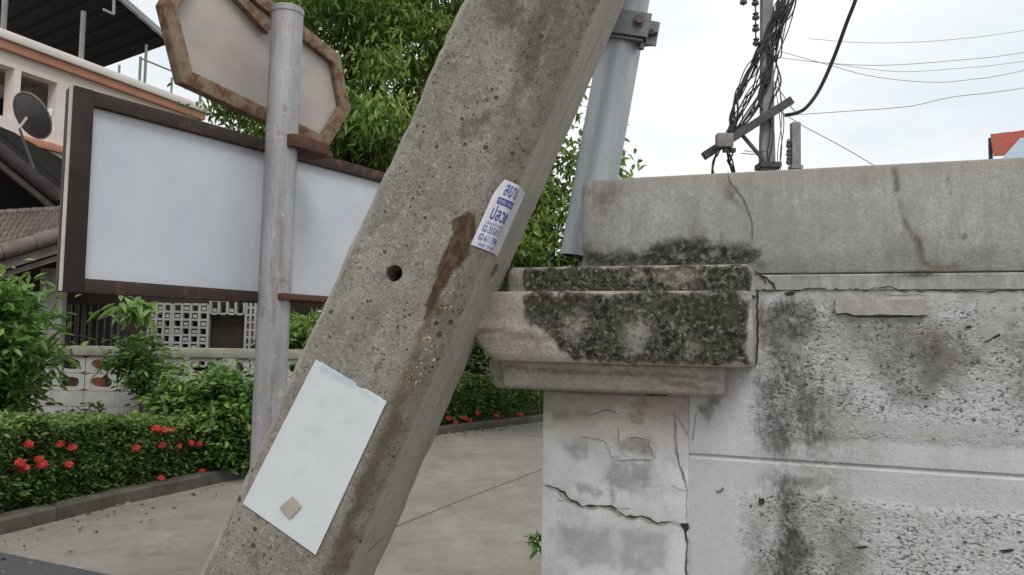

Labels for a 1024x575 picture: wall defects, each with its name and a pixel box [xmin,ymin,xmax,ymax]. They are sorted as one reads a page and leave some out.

rust [424,212,476,319]
leakage [582,238,761,266]
crack [727,170,753,240]
crack [545,391,696,575]